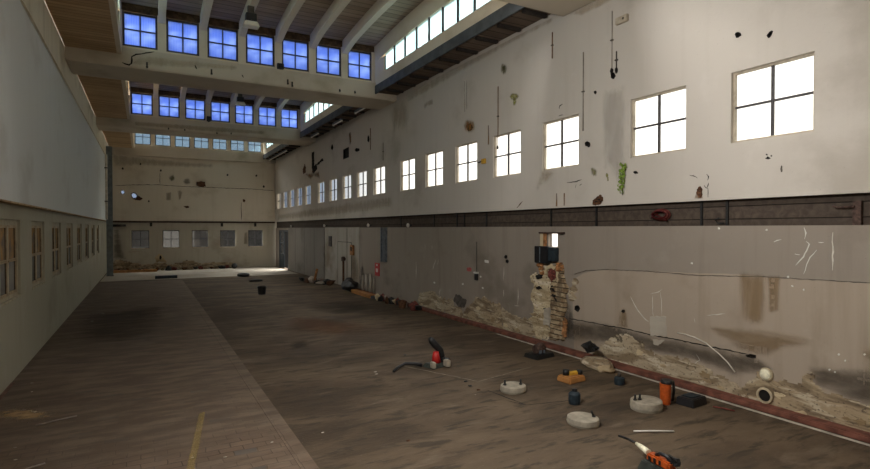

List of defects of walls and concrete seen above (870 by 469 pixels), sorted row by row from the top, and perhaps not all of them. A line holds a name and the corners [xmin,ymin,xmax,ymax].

spalling [418,262,579,342]
spalling [600,316,870,432]